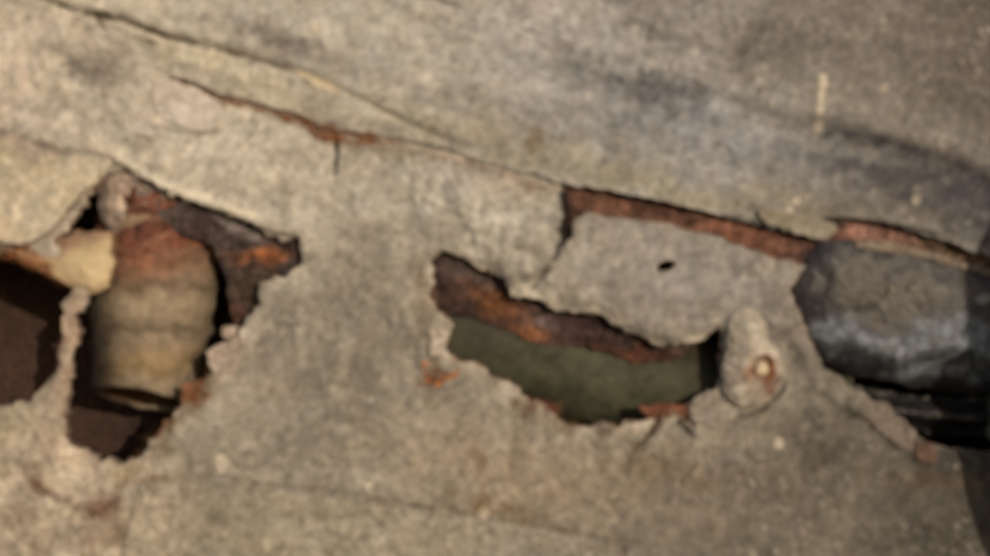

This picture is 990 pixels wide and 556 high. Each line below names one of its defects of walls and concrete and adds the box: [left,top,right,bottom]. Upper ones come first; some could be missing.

crack [56,3,311,83]
corrosion [171,79,401,145]
crack [332,140,340,175]
crack [541,190,573,278]
crack [824,217,938,235]
peeling [0,130,303,466]
spalling [421,251,738,433]
corrosion [756,354,776,382]
spalling [790,268,990,464]